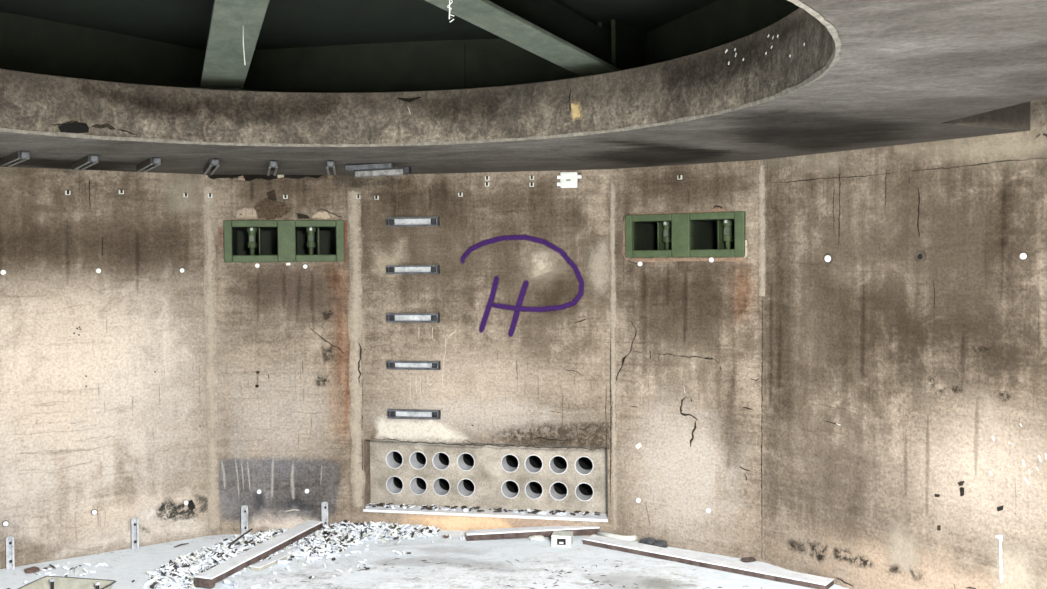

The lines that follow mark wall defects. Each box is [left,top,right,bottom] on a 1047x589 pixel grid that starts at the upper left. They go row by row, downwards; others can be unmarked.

spalling [51,121,137,135]
crack [773,133,1047,238]
crack [309,321,721,501]
crack [739,297,763,514]
water stain [222,462,250,494]
water stain [255,466,306,530]